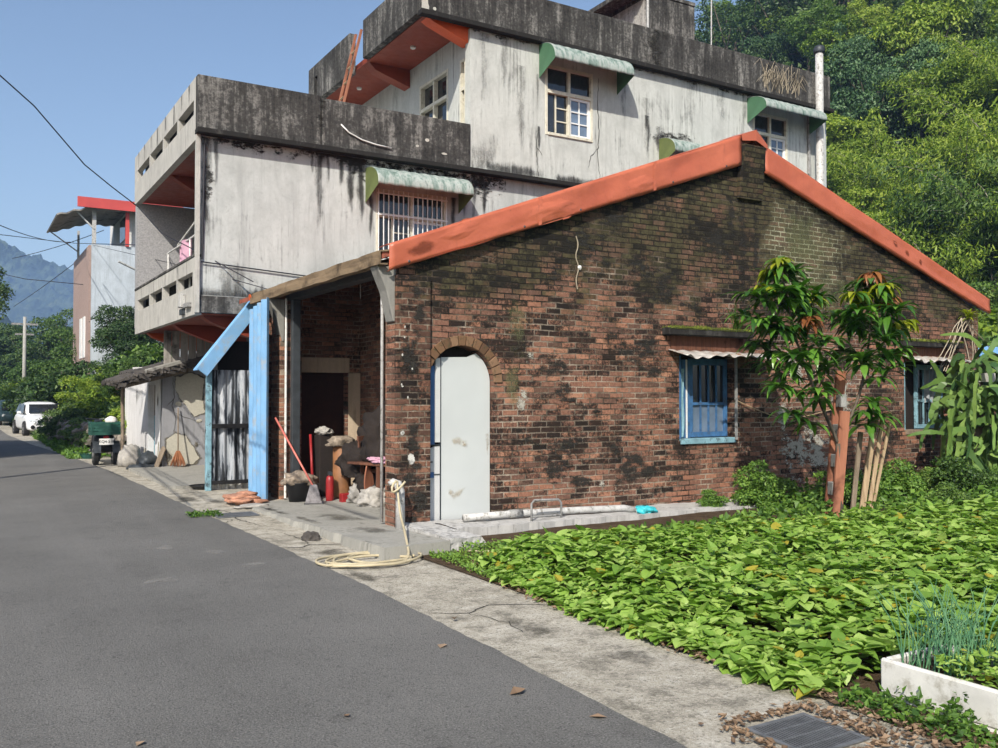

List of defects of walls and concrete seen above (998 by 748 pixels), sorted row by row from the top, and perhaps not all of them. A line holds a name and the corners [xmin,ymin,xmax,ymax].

leakage [202,98,534,231]
crack [588,78,600,174]
leakage [645,111,695,149]
leakage [512,436,665,497]
peeling [777,403,830,484]